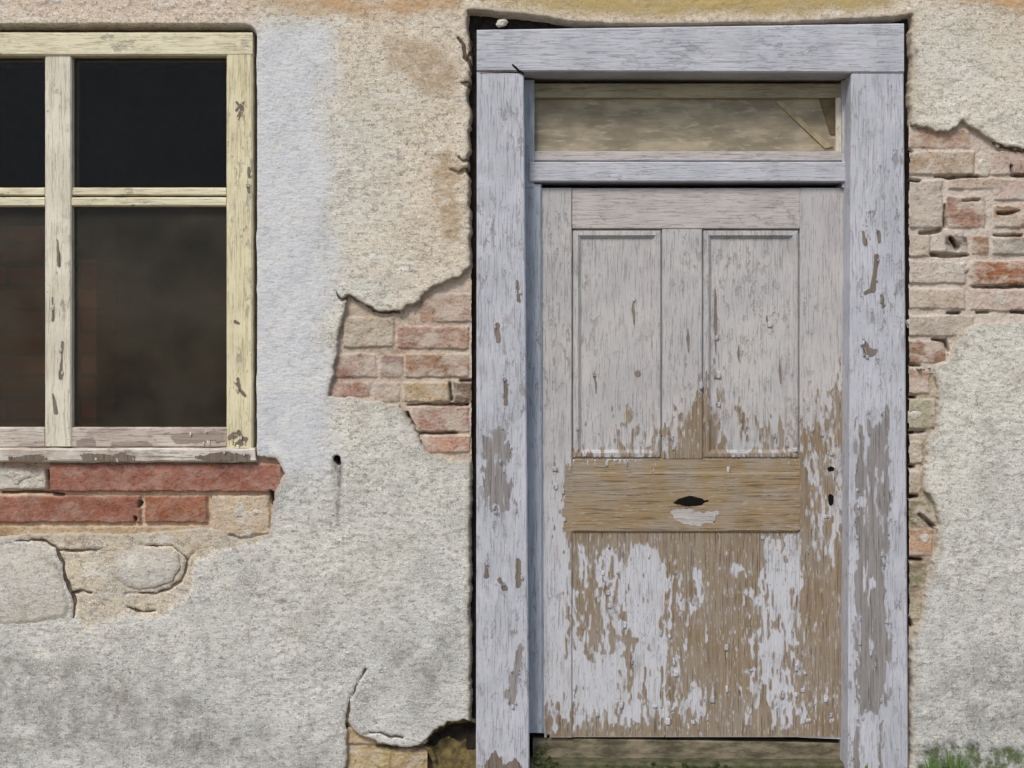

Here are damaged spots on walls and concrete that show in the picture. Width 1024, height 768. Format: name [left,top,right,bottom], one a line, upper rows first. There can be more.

spalling [0,430,285,539]
spalling [329,266,518,515]
spalling [905,123,1024,645]
spalling [347,719,522,768]